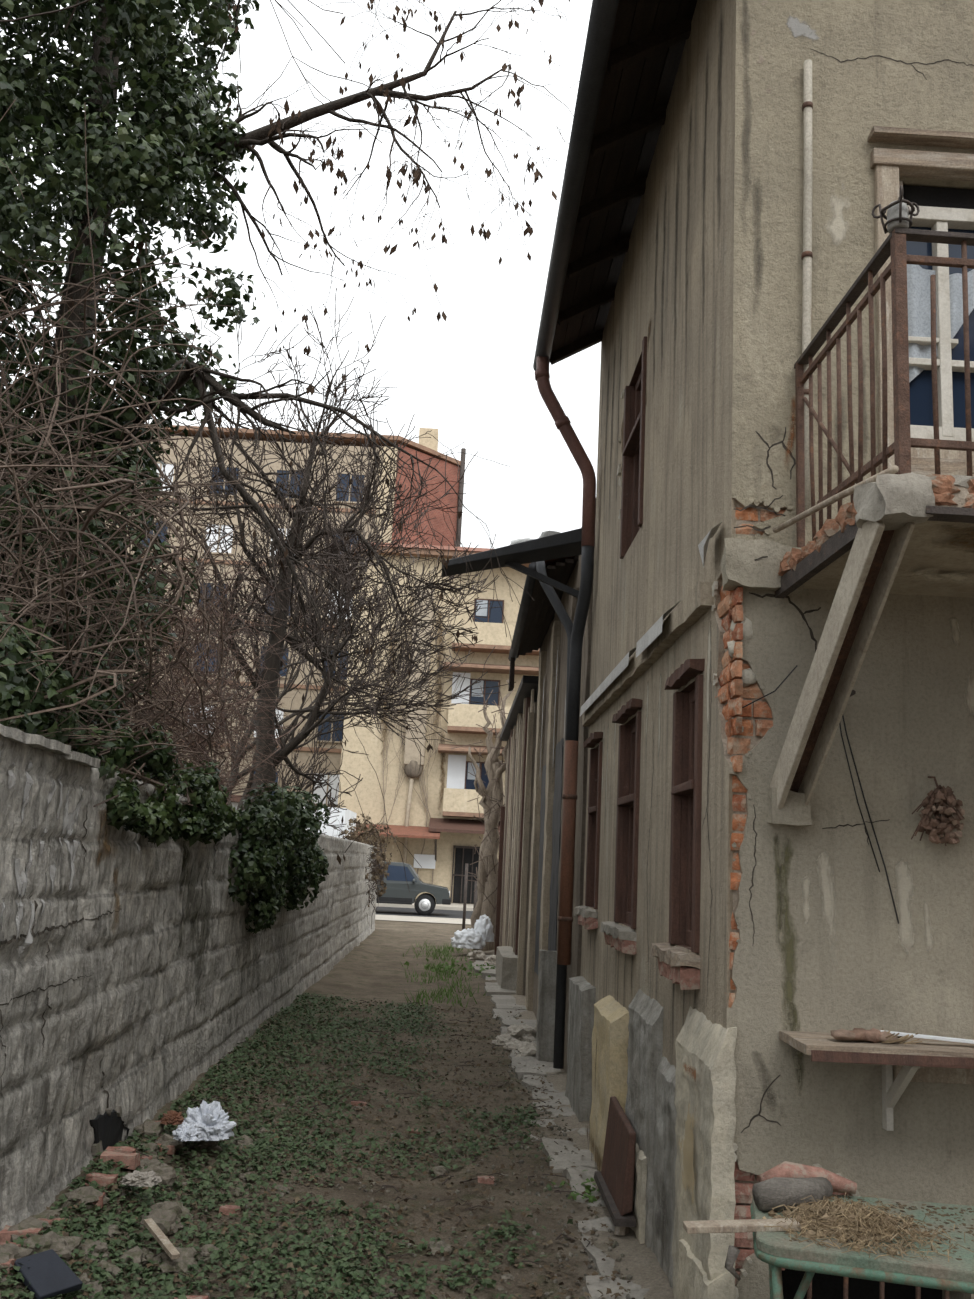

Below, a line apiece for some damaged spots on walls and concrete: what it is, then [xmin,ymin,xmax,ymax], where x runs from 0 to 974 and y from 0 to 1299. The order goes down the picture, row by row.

crack [811,49,974,80]
spalling [735,499,793,540]
crack [734,427,796,532]
spalling [778,502,857,576]
spalling [926,474,974,508]
spalling [712,581,773,894]
crack [0,786,122,1089]
spalling [729,912,741,1008]
water stain [774,838,835,1031]